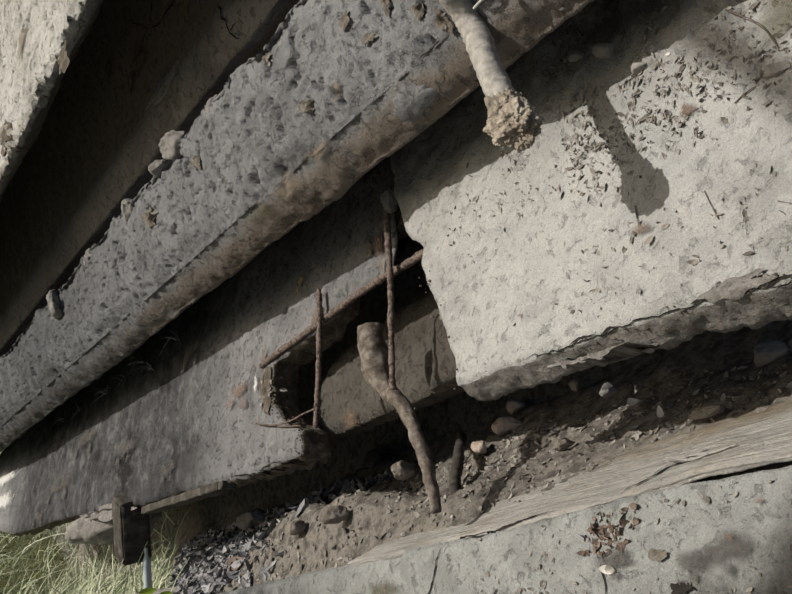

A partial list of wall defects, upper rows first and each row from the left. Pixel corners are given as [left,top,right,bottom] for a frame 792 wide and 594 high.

crack [218,6,240,39]
spalling [259,366,287,415]
crack [427,511,549,594]